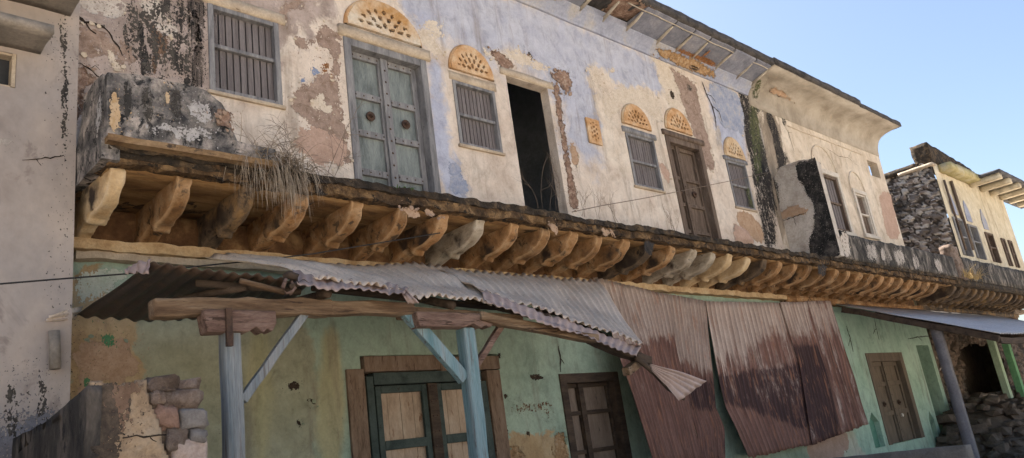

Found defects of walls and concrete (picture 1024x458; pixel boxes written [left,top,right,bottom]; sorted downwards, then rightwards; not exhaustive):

leakage [44,15,78,185]
crack [79,16,123,56]
leakage [92,0,221,151]
flaking render [271,0,354,176]
flaking render [483,45,582,216]
flaking render [598,48,748,173]
leakage [735,93,840,278]
leakage [0,320,81,458]